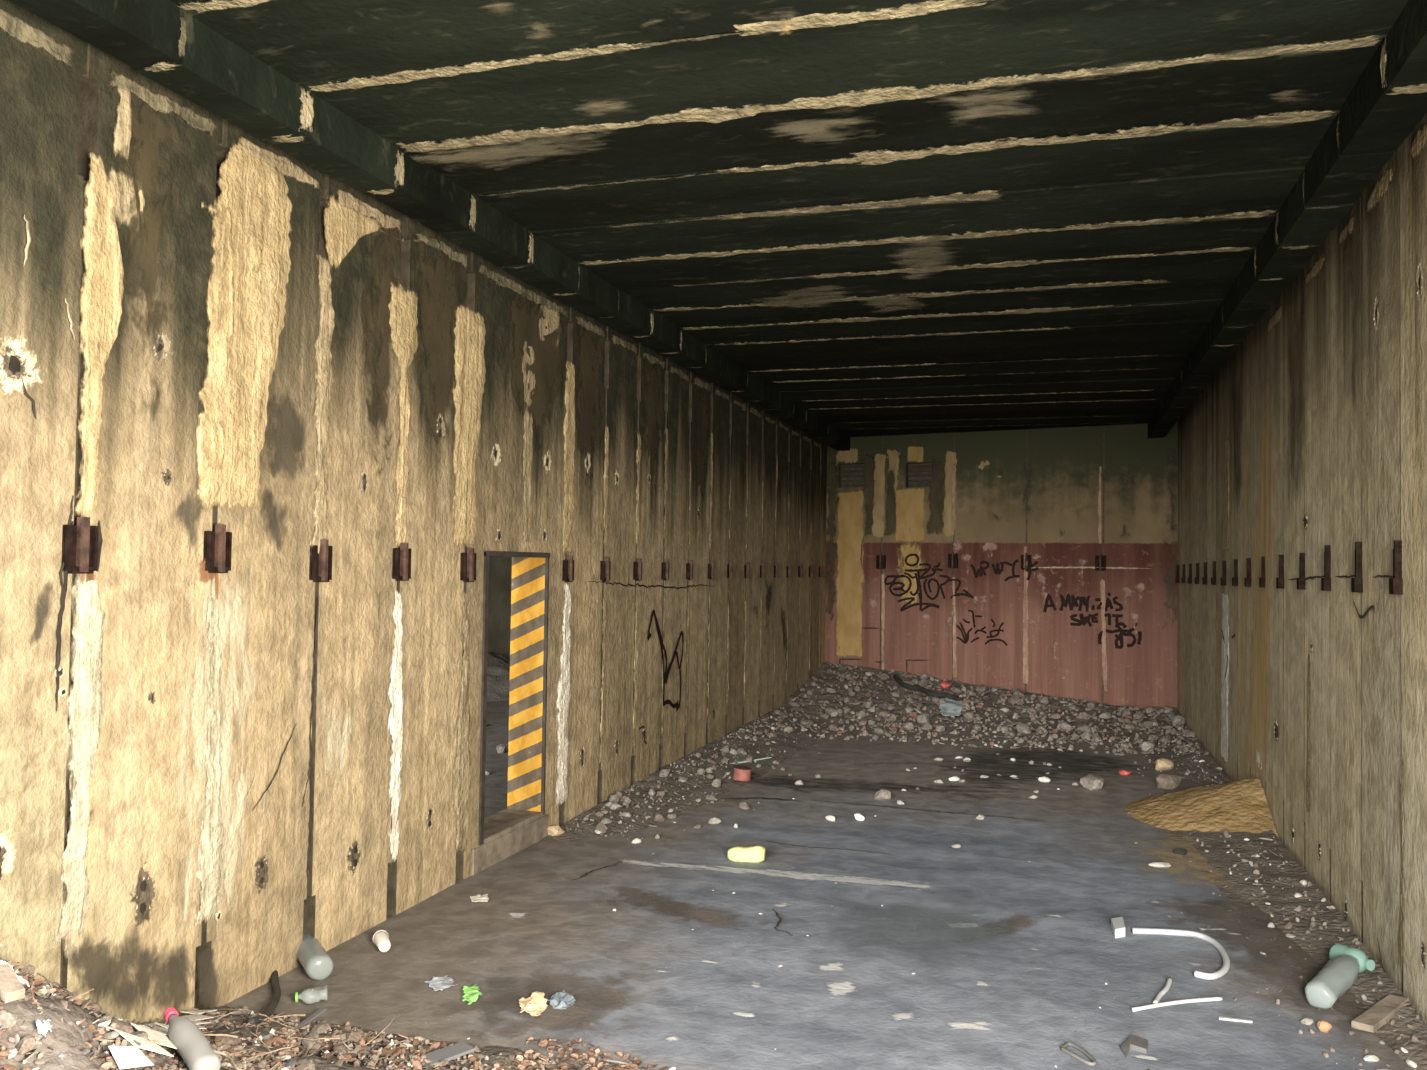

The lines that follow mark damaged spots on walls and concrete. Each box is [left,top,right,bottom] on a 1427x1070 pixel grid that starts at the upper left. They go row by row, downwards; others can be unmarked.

peeling [202,203,235,342]
spalling [0,338,41,394]
damp [36,585,50,639]
spalling [0,831,15,882]
damp [53,577,217,1010]
damp [179,574,251,926]
damp [388,590,403,860]